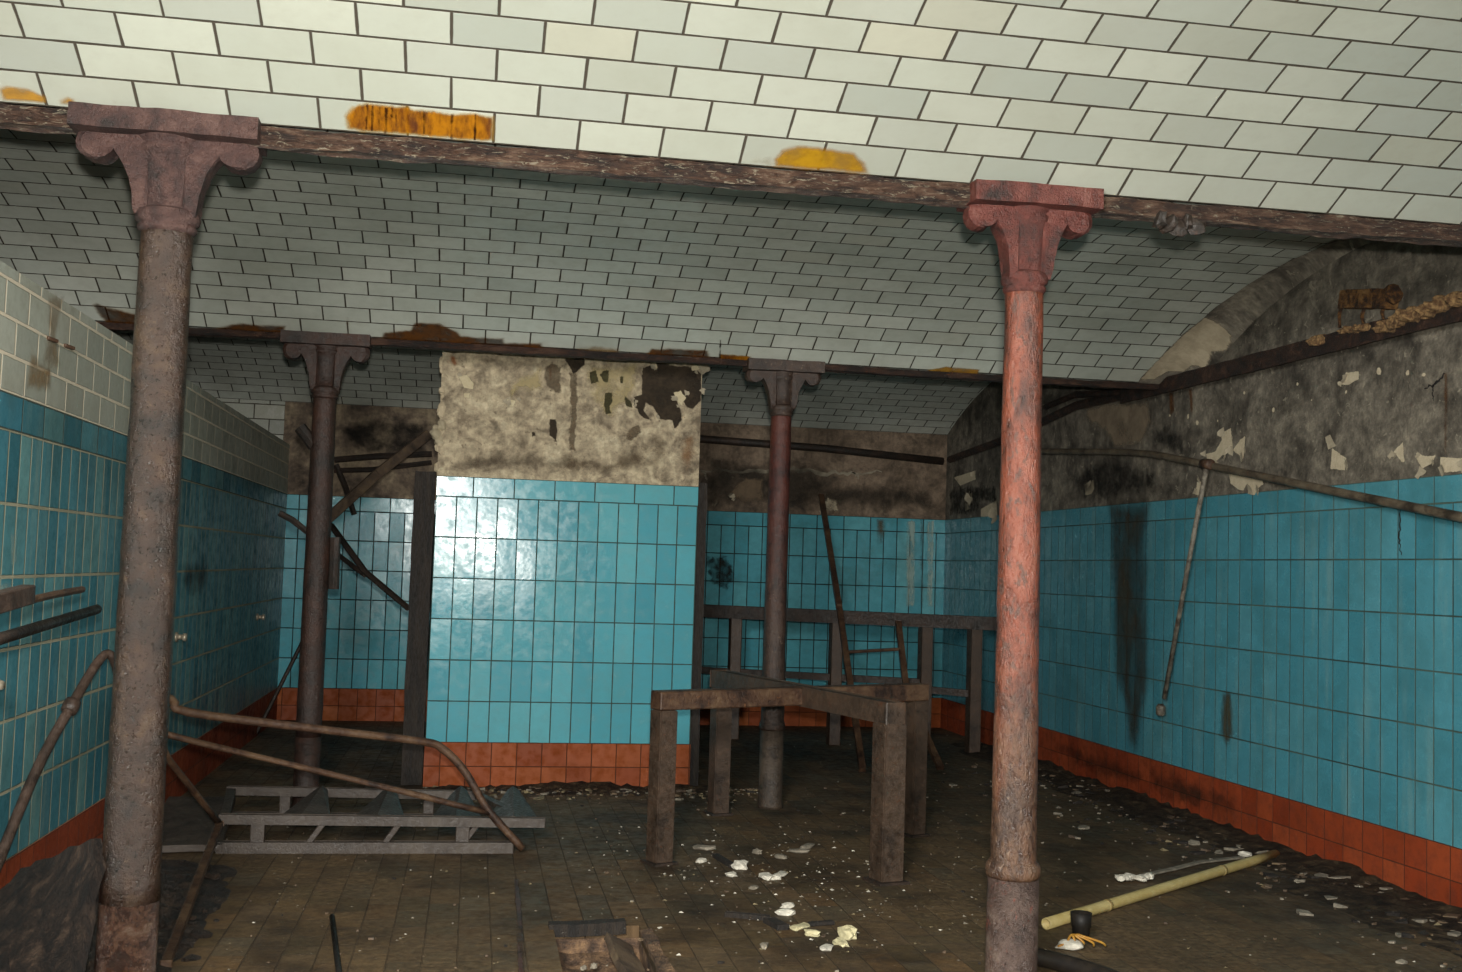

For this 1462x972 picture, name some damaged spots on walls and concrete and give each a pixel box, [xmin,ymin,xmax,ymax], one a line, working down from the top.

rust [346,104,493,140]
rust [776,147,865,172]
rust [95,304,135,324]
rust [220,324,284,333]
peeling [1337,367,1381,394]
flaking render [434,356,474,472]
flaking render [532,419,557,440]
flaking render [590,362,710,440]
peeling [1200,420,1263,496]
peeling [1325,435,1348,470]
peeling [1387,443,1462,479]
leakage [1080,462,1152,737]